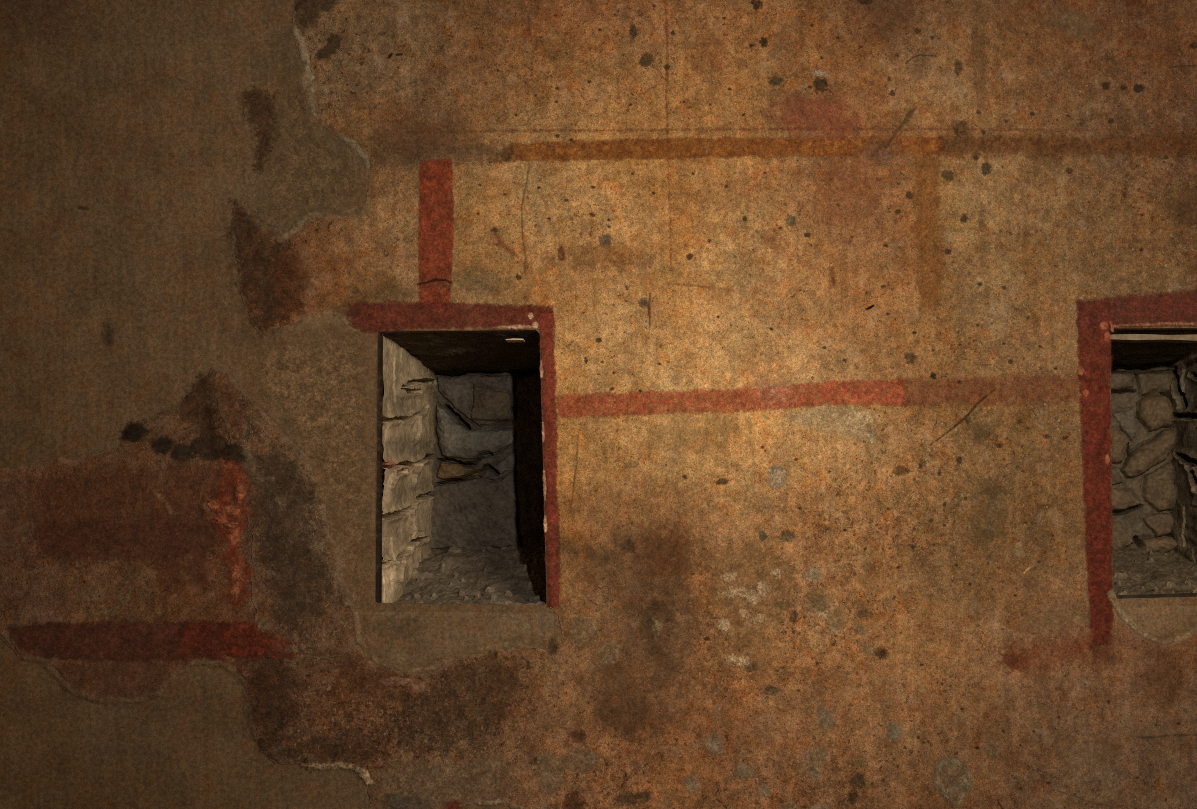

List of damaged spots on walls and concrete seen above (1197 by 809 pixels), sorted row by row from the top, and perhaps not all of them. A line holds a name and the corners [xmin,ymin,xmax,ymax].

peeling [293,0,340,116]
damp [221,77,370,632]
spalling [498,313,538,329]
spalling [122,371,527,693]
spalling [303,762,371,784]